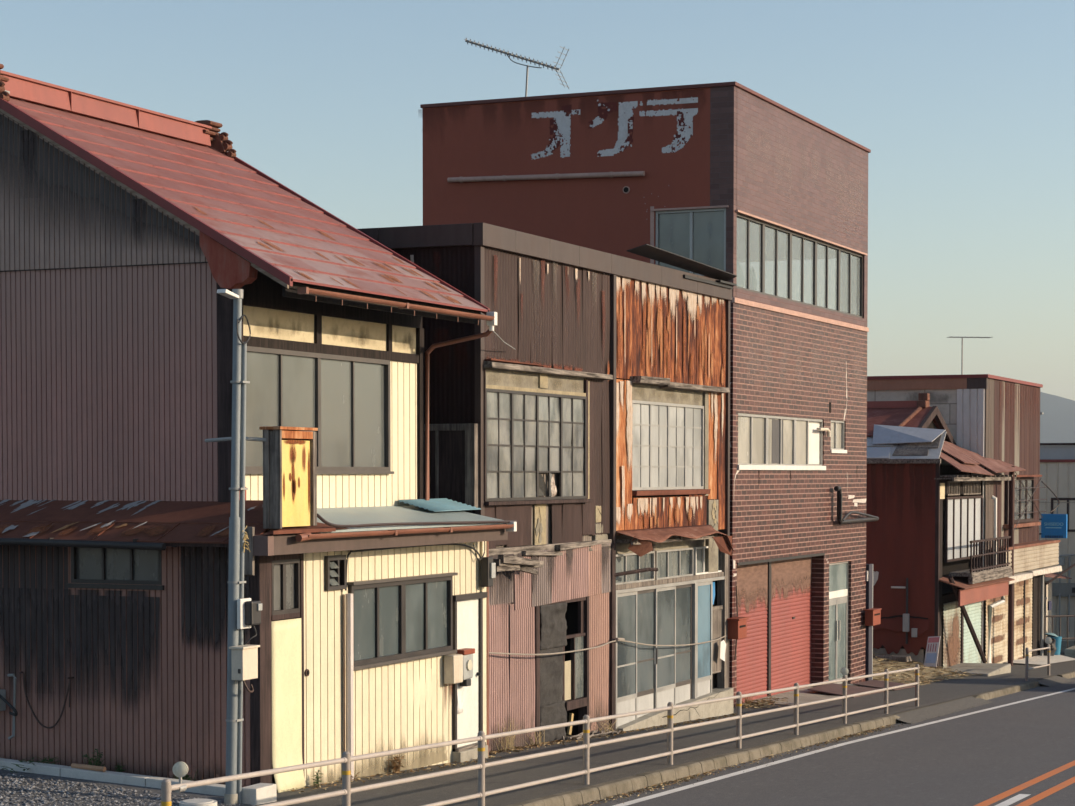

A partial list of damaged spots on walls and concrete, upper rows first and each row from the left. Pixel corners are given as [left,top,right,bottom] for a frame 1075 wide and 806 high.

peeling [538,100,635,159]
peeling [666,111,692,153]
damp [0,114,202,250]
rust [566,267,590,304]
rust [607,291,726,384]
rust [638,497,702,529]
damp [0,545,160,704]
damp [181,546,229,648]
damp [493,571,514,592]
damp [489,549,573,576]
rust [737,557,812,612]